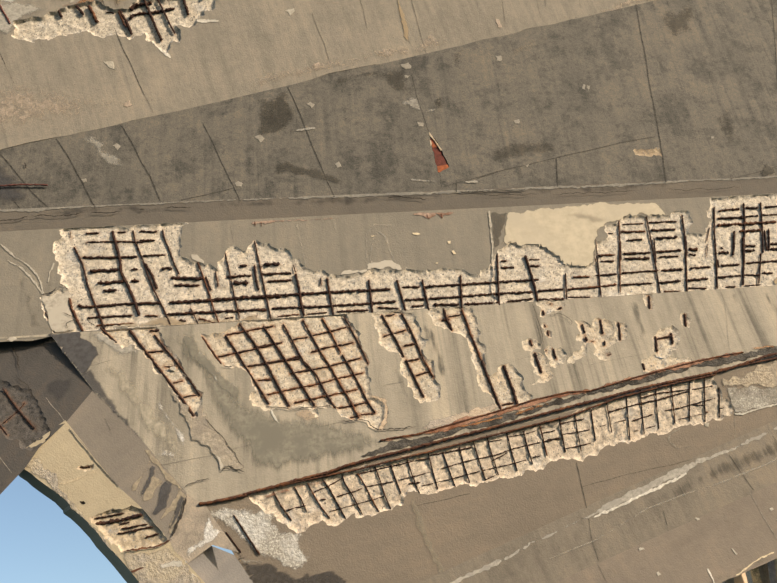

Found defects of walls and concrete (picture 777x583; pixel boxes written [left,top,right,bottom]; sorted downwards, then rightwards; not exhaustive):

spalling [11,0,216,53]
crack [0,211,118,221]
spalling [40,194,777,470]
corrosion [605,352,738,385]
spalling [0,379,51,453]
corrosion [423,389,588,434]
spalling [248,360,777,534]
spalling [88,505,168,552]